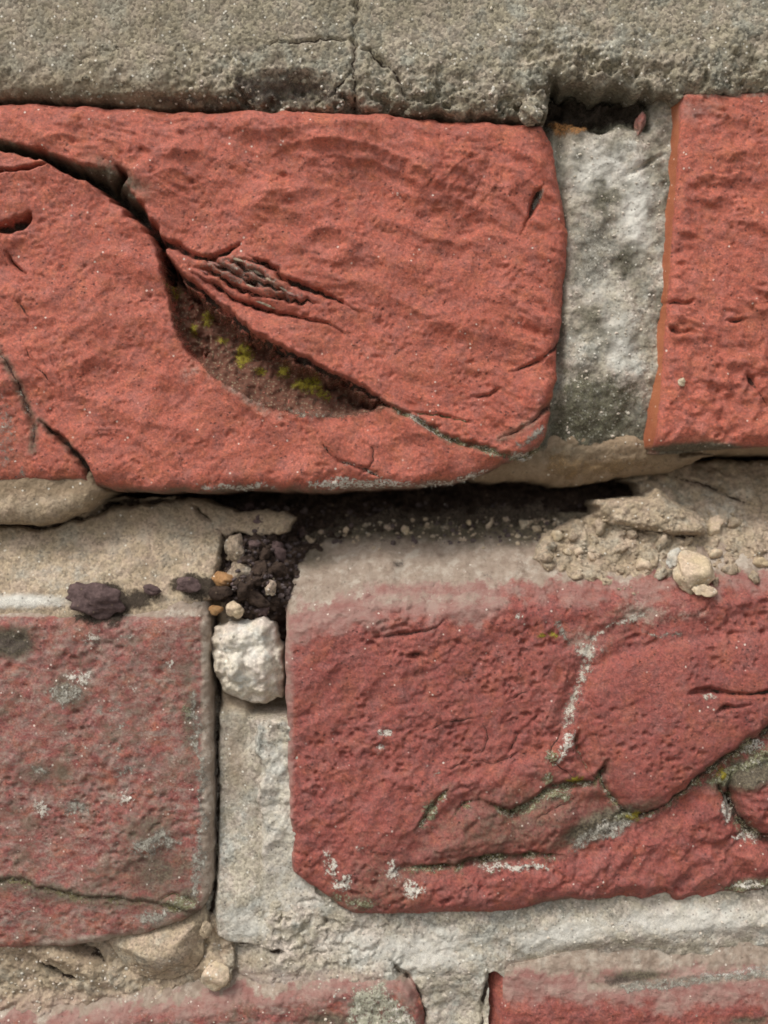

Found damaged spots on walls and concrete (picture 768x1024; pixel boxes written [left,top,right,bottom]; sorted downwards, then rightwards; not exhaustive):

crack [266,38,405,109]
crack [0,222,28,234]
crack [1,349,91,473]
spalling [157,248,389,419]
crack [7,151,550,461]
crack [518,343,558,371]
crack [419,718,768,844]
crack [410,850,556,874]